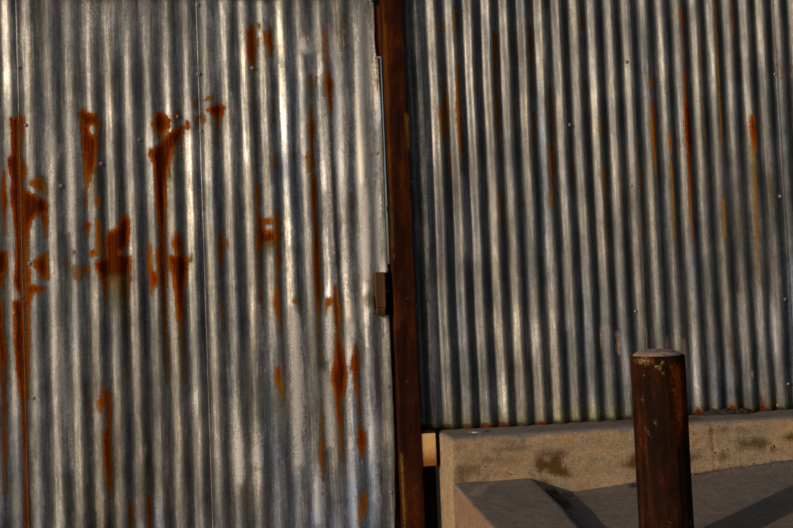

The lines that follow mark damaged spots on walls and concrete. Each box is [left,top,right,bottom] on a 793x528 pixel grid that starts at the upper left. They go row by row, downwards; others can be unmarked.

rust [0,115,49,528]
rust [65,108,132,323]
rust [147,94,231,386]
rust [245,23,273,131]
rust [254,145,282,331]
rust [305,2,366,462]
rust [681,6,694,250]
rust [748,115,766,282]
rust [88,387,113,496]